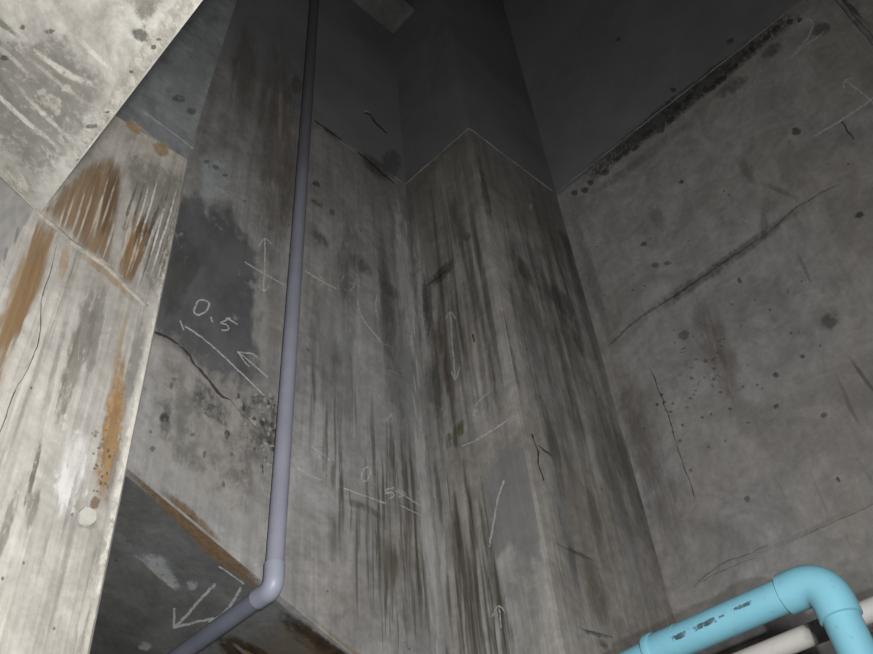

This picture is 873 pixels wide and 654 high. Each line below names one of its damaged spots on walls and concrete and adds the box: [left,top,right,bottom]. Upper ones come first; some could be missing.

mould [595,19,786,175]
rust [0,224,52,377]
crack [0,246,57,432]
rust [47,160,119,259]
rust [91,363,125,508]
rust [120,214,147,281]
crack [154,332,230,400]
water stain [395,215,452,654]
crack [532,434,553,481]
crack [649,366,695,497]